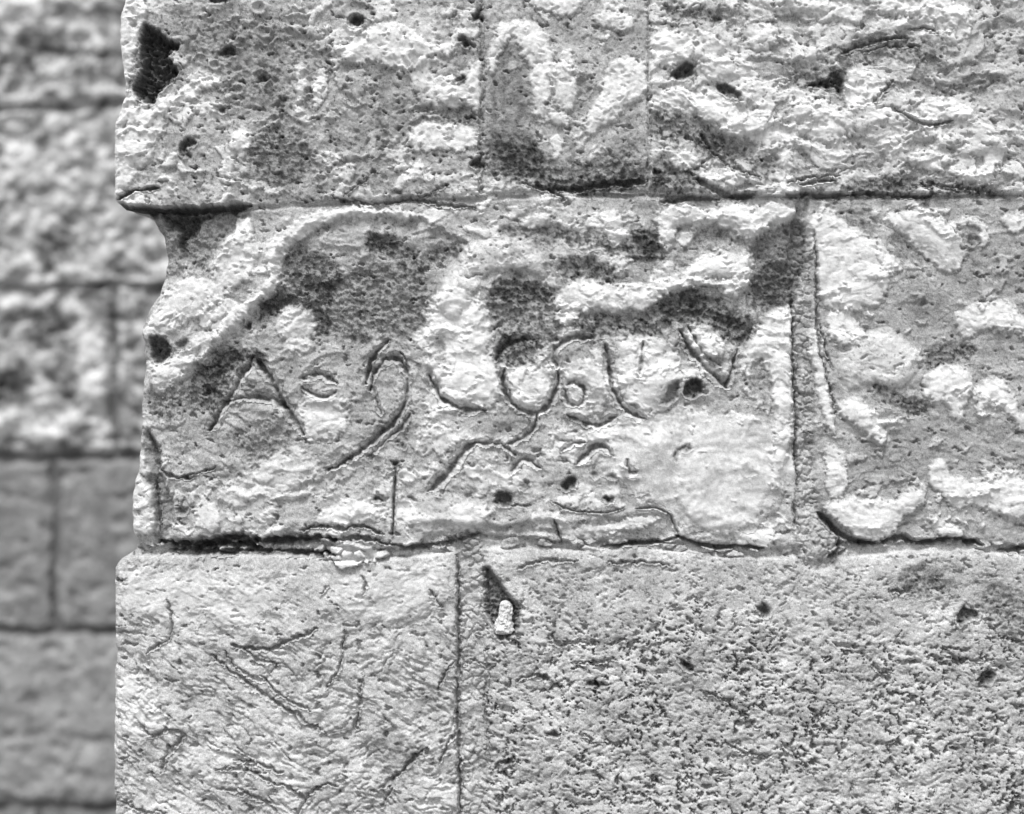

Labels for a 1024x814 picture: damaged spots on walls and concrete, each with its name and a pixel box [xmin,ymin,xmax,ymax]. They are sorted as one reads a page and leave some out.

peeling [114,0,224,202]
peeling [227,124,253,153]
spalling [479,565,556,658]